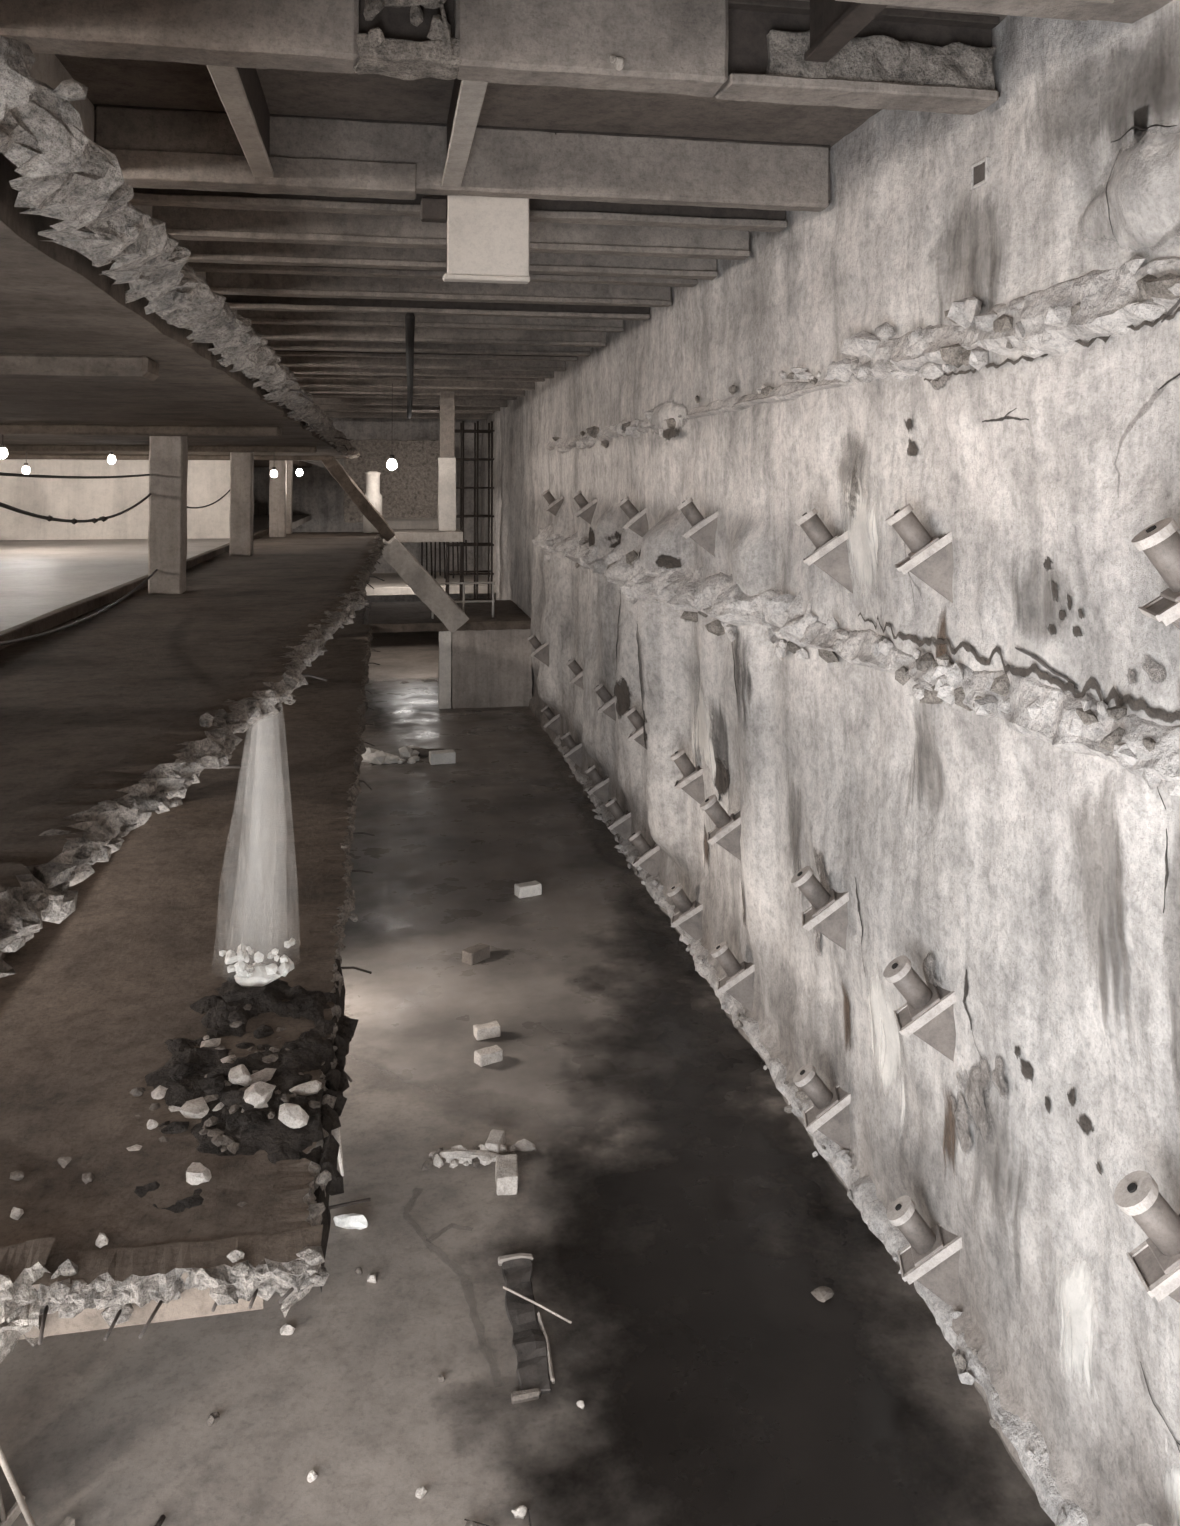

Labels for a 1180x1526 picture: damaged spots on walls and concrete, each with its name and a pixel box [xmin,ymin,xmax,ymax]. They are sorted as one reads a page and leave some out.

spalling [363,0,454,55]
peeling [756,295,1044,396]
peeling [1045,298,1080,327]
peeling [1125,255,1180,321]
peeling [552,408,681,454]
spalling [905,419,918,456]
crack [858,612,1180,723]
spalling [0,532,385,1109]
spalling [0,1128,370,1364]
water stain [512,899,1029,1526]
water stain [1058,1262,1093,1390]